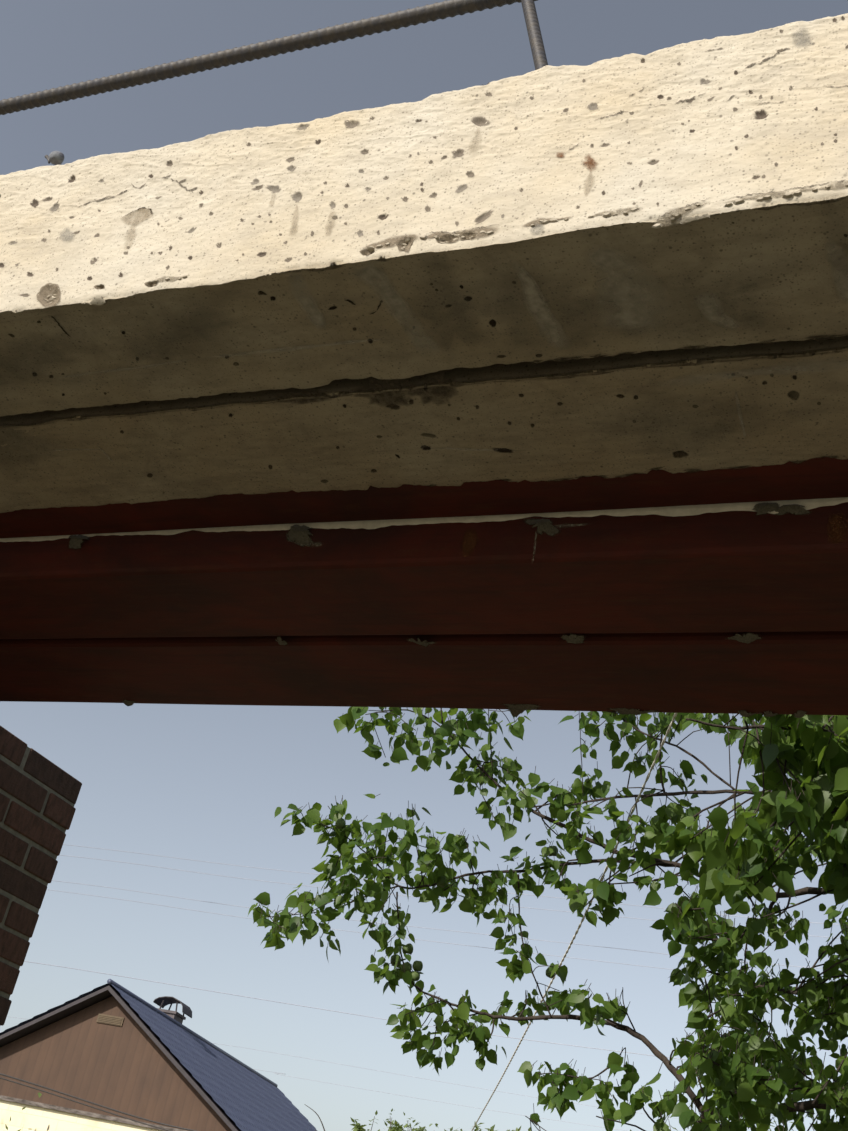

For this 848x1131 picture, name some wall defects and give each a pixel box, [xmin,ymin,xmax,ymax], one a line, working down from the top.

spalling [525,180,643,233]
spalling [652,200,705,229]
spalling [725,180,848,207]